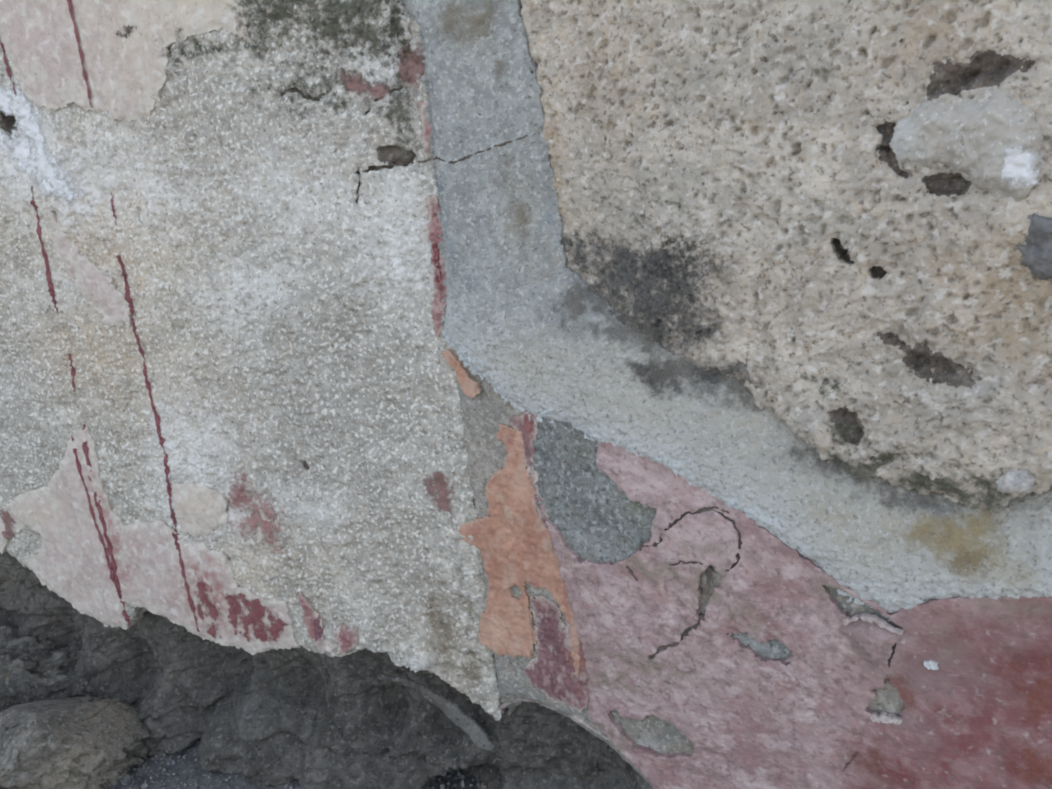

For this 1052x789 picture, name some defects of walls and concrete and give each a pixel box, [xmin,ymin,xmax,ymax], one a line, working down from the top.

crack [356,135,528,203]
peeling [423,472,454,513]
peeling [0,427,359,655]
peeling [459,410,657,747]
crack [627,506,743,659]
flaking render [827,586,901,628]
flaking render [732,632,792,663]
crack [887,644,896,681]
peeling [379,674,494,751]
flaking render [610,709,695,755]